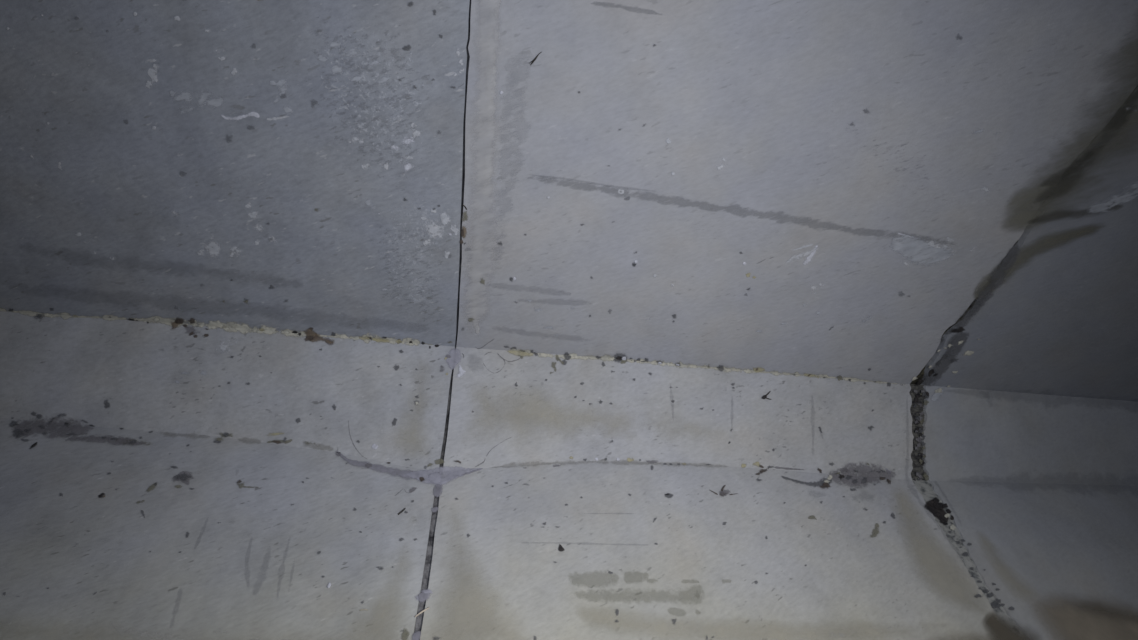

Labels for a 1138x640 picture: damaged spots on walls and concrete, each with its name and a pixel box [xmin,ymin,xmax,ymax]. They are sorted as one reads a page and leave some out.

damp [890,233,954,265]
spalling [925,497,956,530]